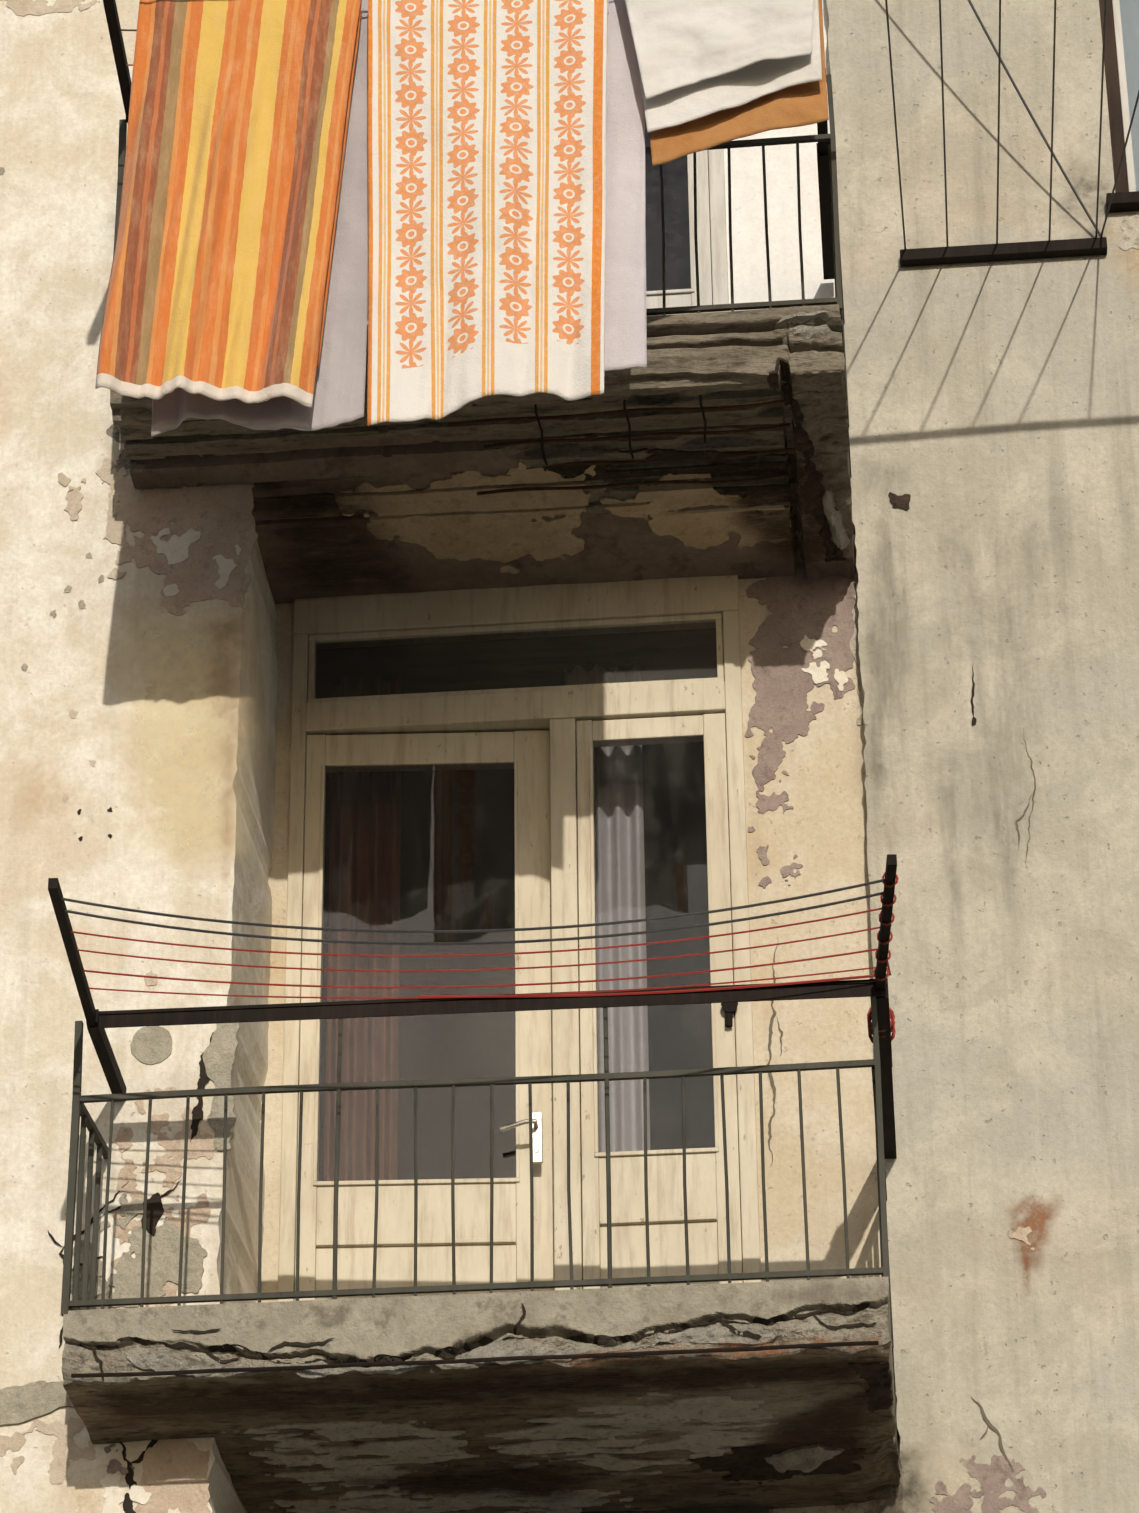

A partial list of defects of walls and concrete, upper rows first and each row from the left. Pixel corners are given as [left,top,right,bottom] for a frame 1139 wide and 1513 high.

peeling [0,0,100,17]
peeling [58,424,258,616]
peeling [336,357,864,889]
flaking render [71,1023,240,1310]
crack [48,1179,878,1381]
rust [1017,1205,1051,1270]
spalling [71,1324,894,1413]
peeling [0,1416,211,1513]
crack [119,1439,159,1513]
peeling [221,1391,866,1513]
peeling [773,1499,885,1513]
peeling [929,1446,1046,1513]